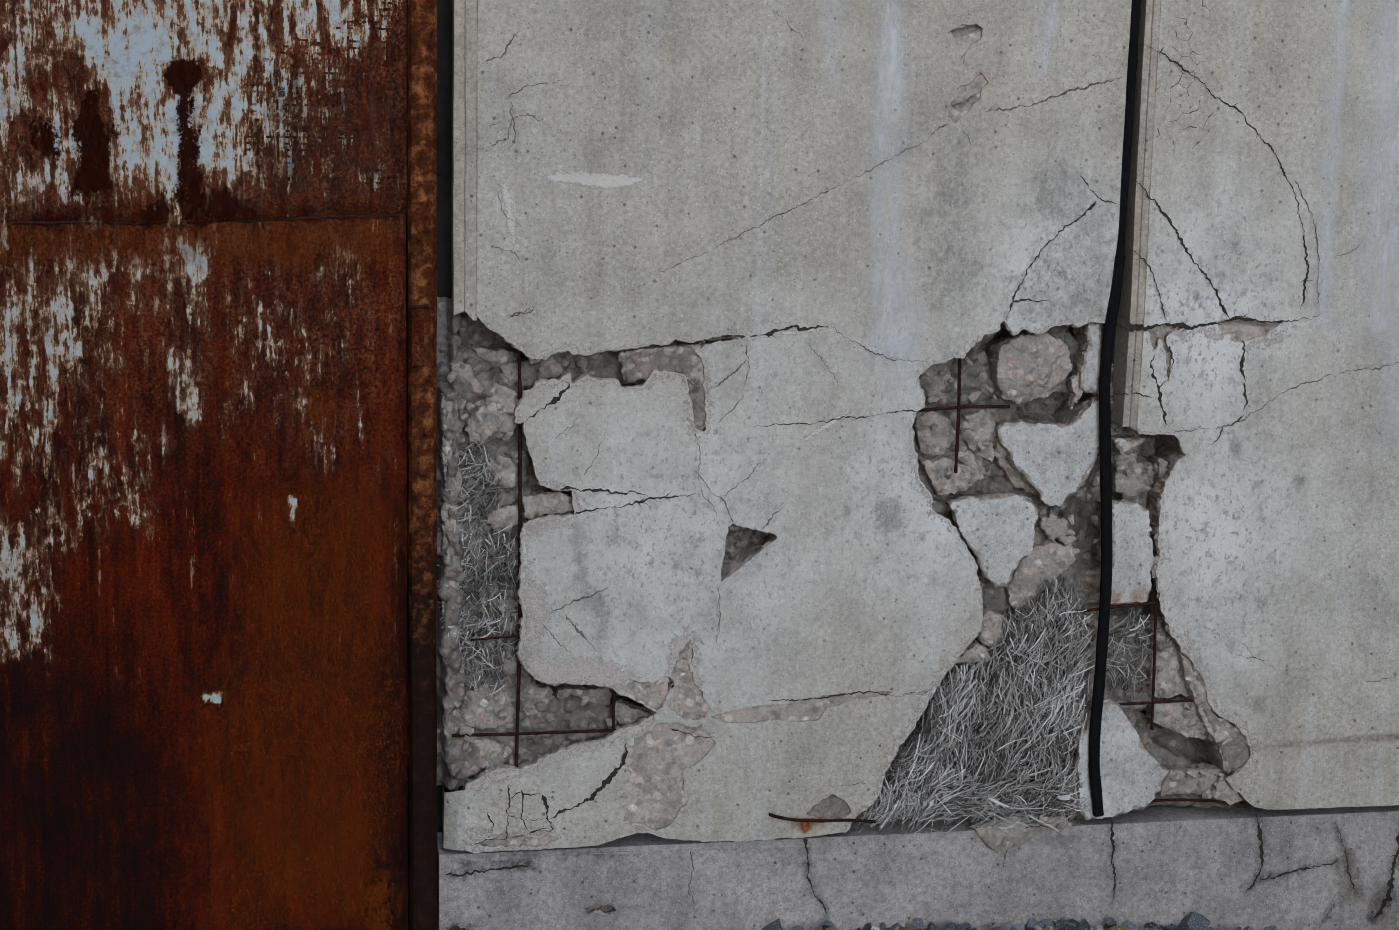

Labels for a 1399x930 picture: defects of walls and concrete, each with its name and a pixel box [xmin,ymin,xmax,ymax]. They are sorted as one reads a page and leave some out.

crack [485,30,519,62]
spalling [948,24,981,59]
corrosion [28,89,120,200]
corrosion [141,47,399,232]
crack [490,80,560,261]
crack [657,78,1119,274]
crack [1006,0,1399,445]
spalling [1148,319,1297,373]
spalling [436,297,887,833]
spalling [806,313,1261,835]
spalling [466,825,558,852]
crack [1245,813,1399,925]